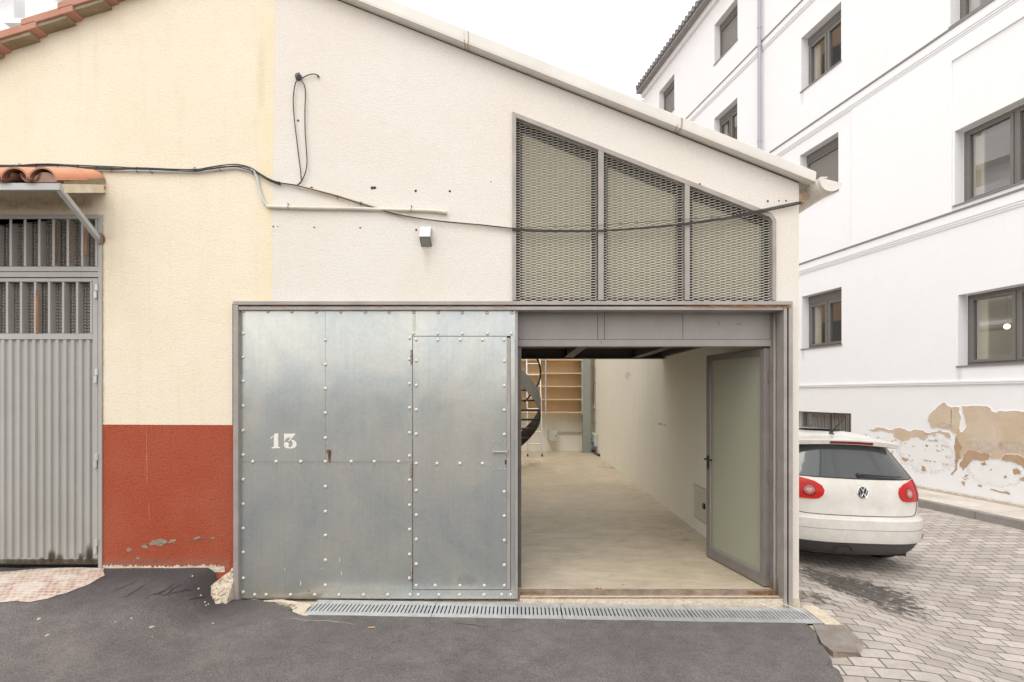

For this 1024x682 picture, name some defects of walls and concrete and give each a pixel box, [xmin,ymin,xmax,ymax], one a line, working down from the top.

peeling [865,401,1024,495]
spalling [102,539,233,606]